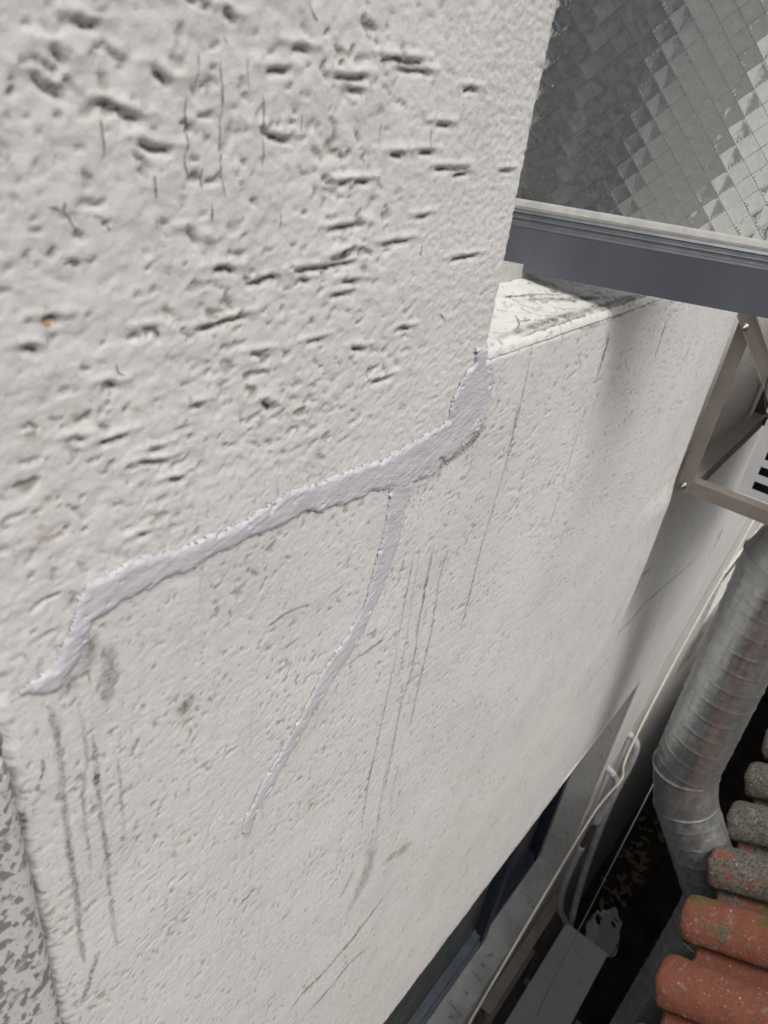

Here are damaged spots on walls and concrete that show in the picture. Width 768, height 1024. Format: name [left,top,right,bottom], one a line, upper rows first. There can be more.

crack [18,343,495,837]